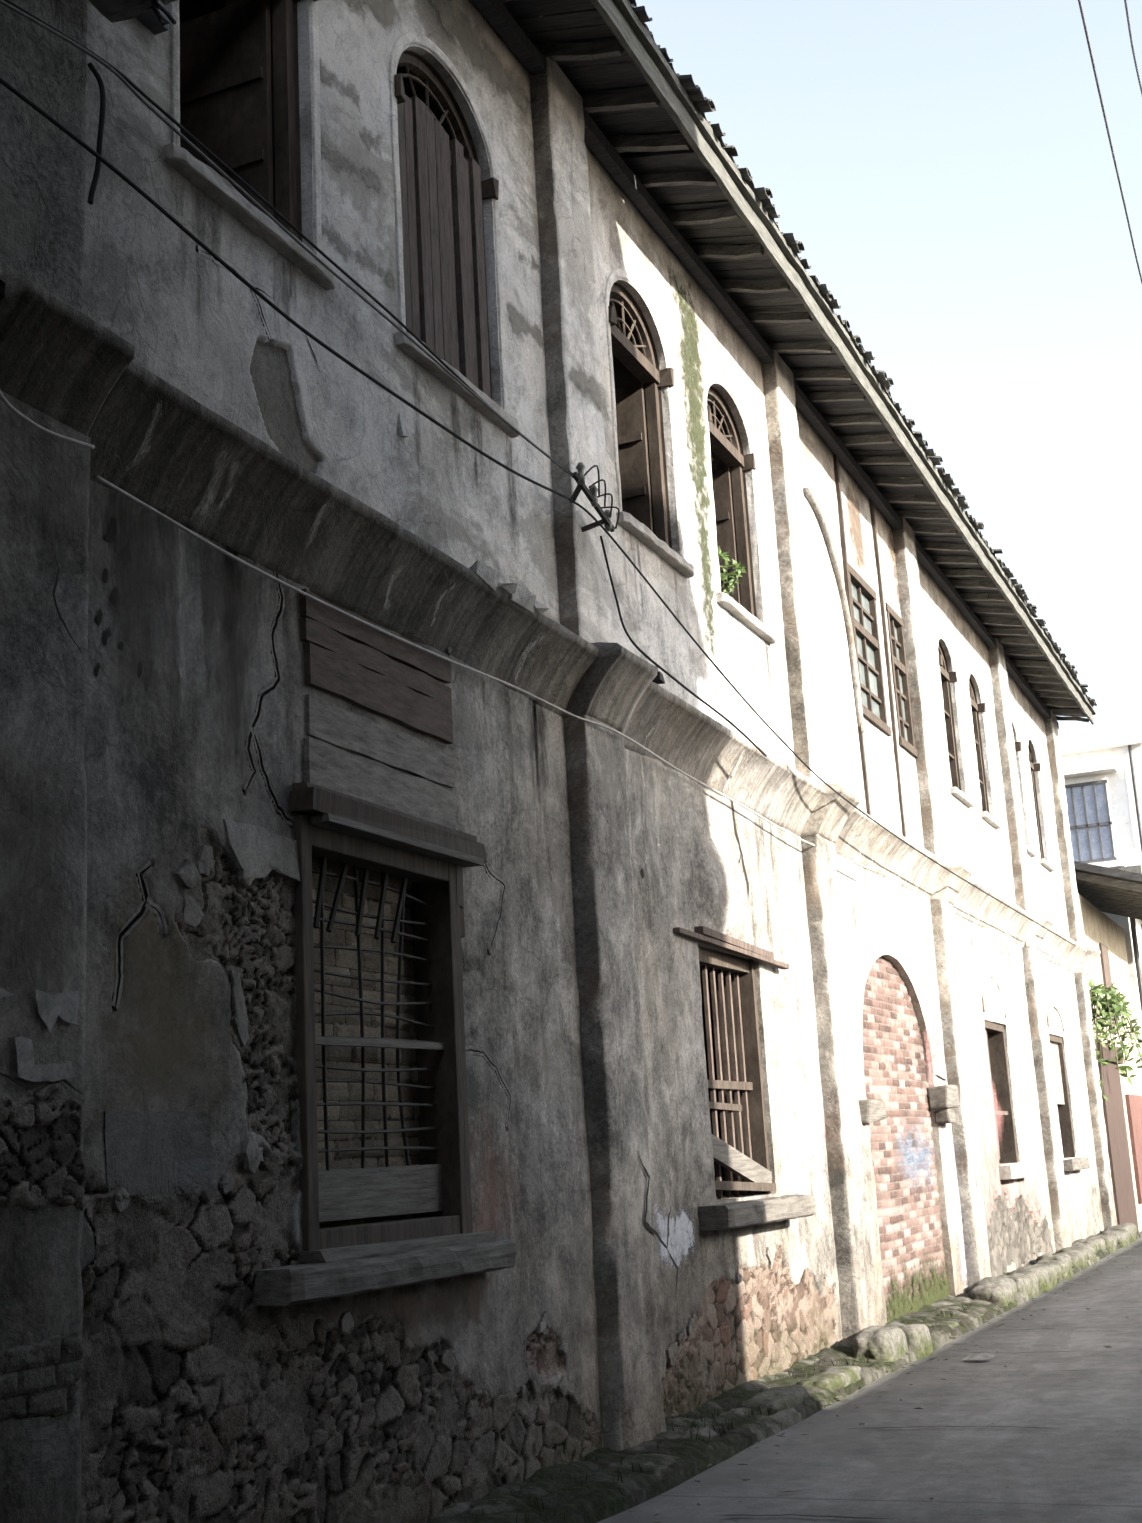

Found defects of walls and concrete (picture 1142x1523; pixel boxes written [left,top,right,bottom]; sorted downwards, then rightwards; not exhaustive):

crack [242,572,294,827]
crack [112,860,168,1009]
flaking render [79,819,603,1523]
flaking render [987,1193,1054,1277]
flaking render [661,1245,837,1417]